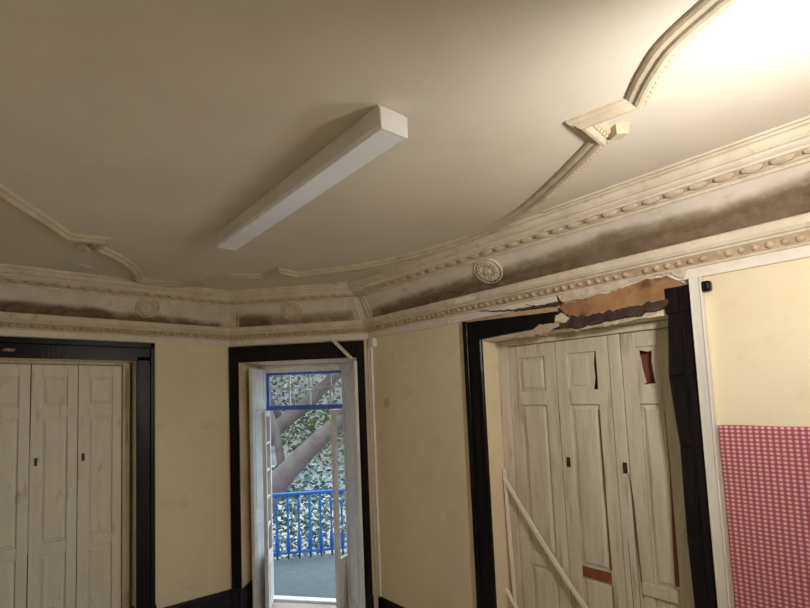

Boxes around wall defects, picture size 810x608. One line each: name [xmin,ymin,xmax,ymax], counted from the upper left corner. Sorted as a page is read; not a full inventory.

water stain [375,179,810,317]
water stain [0,302,218,327]
flaking render [508,268,688,339]